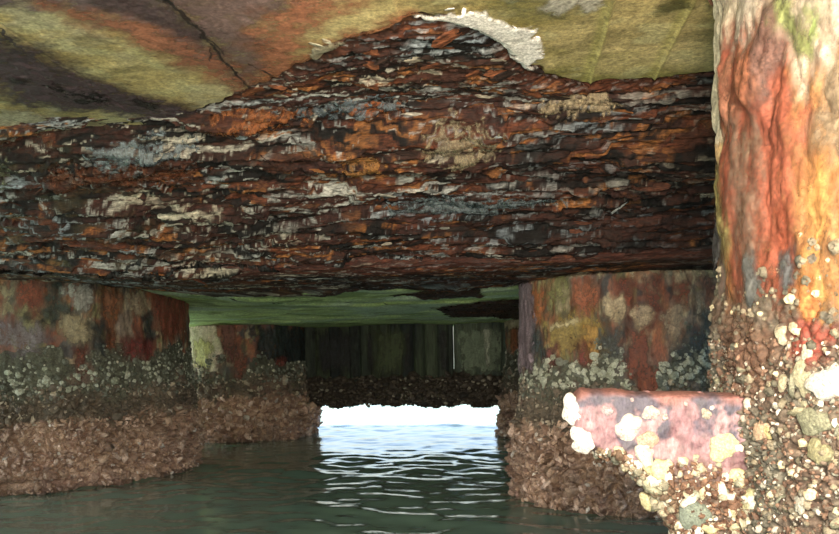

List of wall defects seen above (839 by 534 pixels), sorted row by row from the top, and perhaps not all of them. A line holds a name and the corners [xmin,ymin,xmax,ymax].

crack [163,0,284,89]
spalling [0,8,714,123]
damp [0,109,46,127]
rust [206,107,313,138]
rust [349,100,408,123]
rust [39,158,212,195]
rust [330,155,388,177]
rust [717,9,839,382]
rust [98,285,153,361]
rust [151,294,186,339]
rust [532,278,610,372]